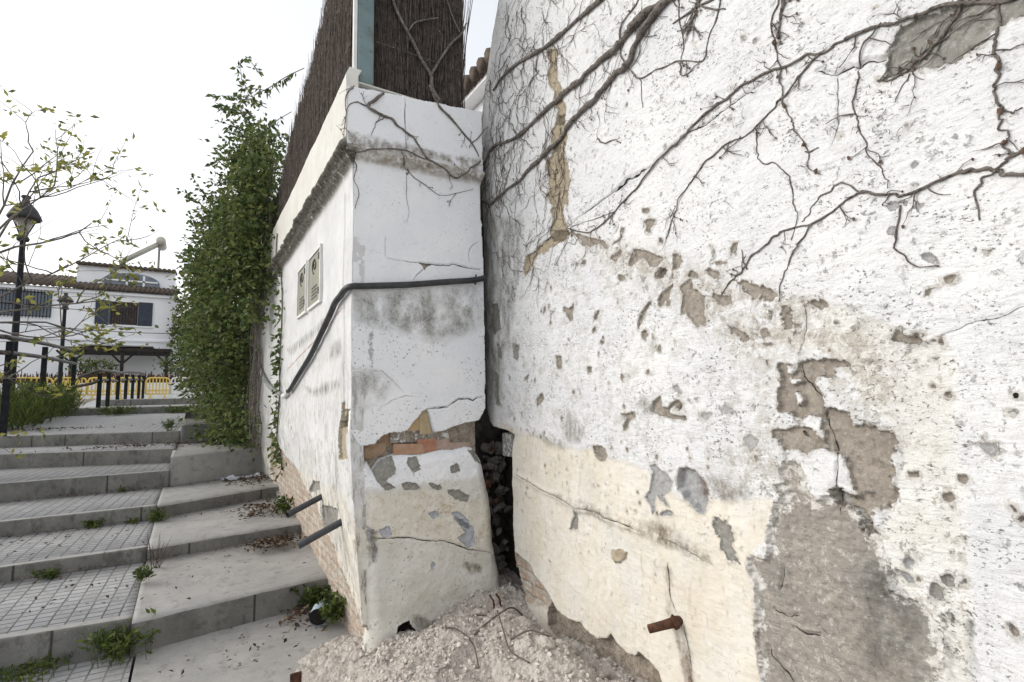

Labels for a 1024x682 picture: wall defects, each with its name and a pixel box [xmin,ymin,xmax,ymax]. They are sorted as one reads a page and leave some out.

peeling [878,0,1024,83]
peeling [517,48,828,352]
flaking render [270,428,368,645]
peeling [366,525,392,563]
flaking render [338,402,480,548]
crack [377,186,637,578]
spalling [515,553,662,682]
peeling [635,349,967,682]
crack [800,299,843,512]